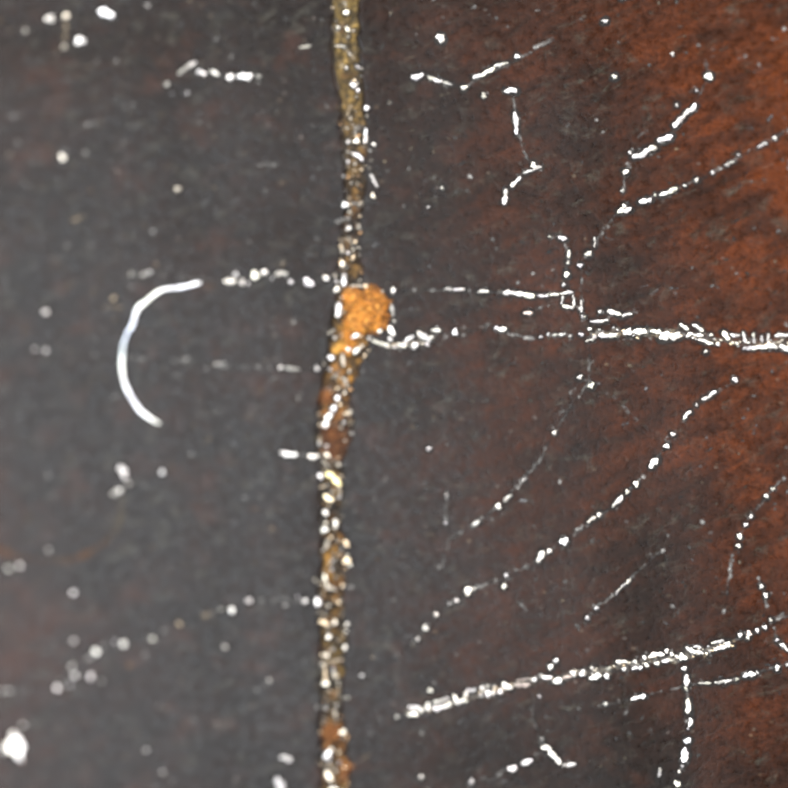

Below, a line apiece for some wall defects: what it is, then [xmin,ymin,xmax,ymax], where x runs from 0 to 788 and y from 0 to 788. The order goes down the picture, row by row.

crack [409,39,550,206]
crack [614,70,788,216]
crack [129,270,193,280]
crack [413,232,788,356]
crack [144,0,464,788]
crack [551,360,597,436]
crack [406,375,739,647]
crack [722,477,785,613]
crack [53,639,130,693]
crack [394,577,788,788]